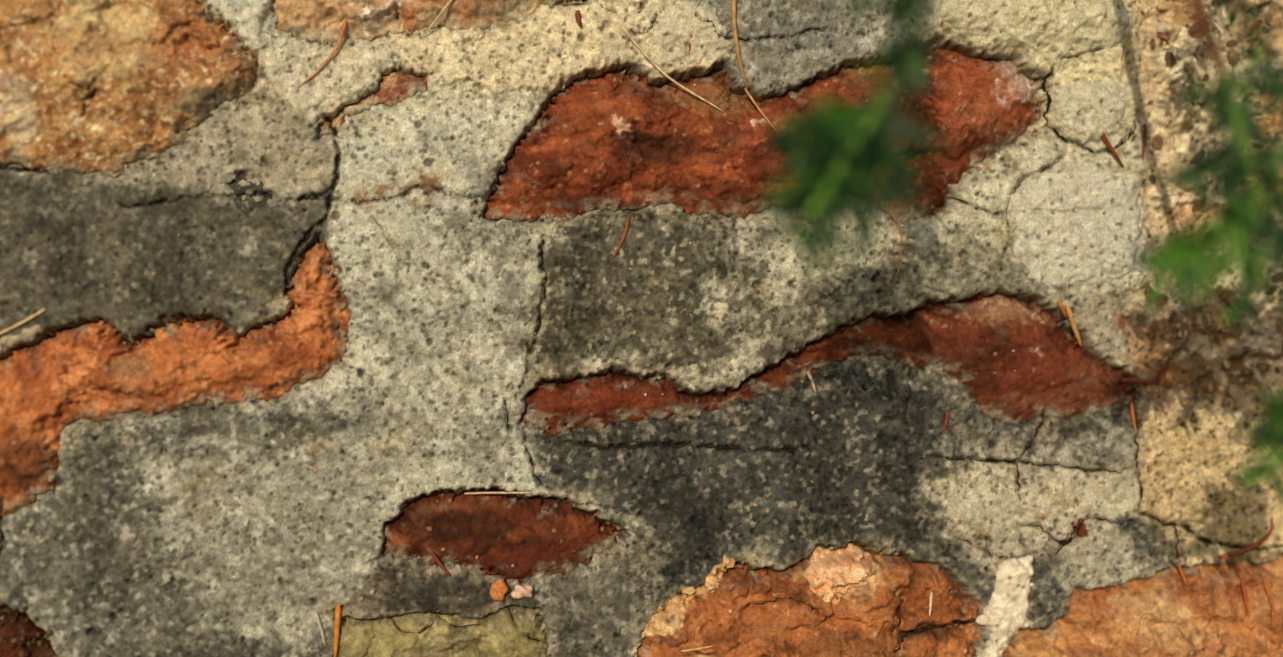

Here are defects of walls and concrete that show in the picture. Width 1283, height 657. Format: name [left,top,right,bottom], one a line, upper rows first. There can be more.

crack [700,19,830,42]
crack [947,48,1136,222]
peeling [0,325,41,351]
crack [504,238,554,491]
crack [565,441,807,452]
crack [937,412,1283,558]
spalling [642,556,735,638]
peeling [803,542,876,605]